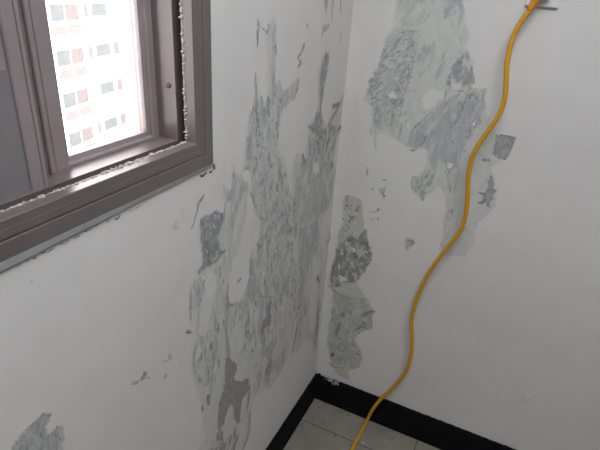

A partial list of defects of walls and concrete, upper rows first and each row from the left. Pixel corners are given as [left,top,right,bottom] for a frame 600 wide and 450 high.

peeling [186,16,344,450]
peeling [363,0,516,258]
peeling [11,410,66,450]